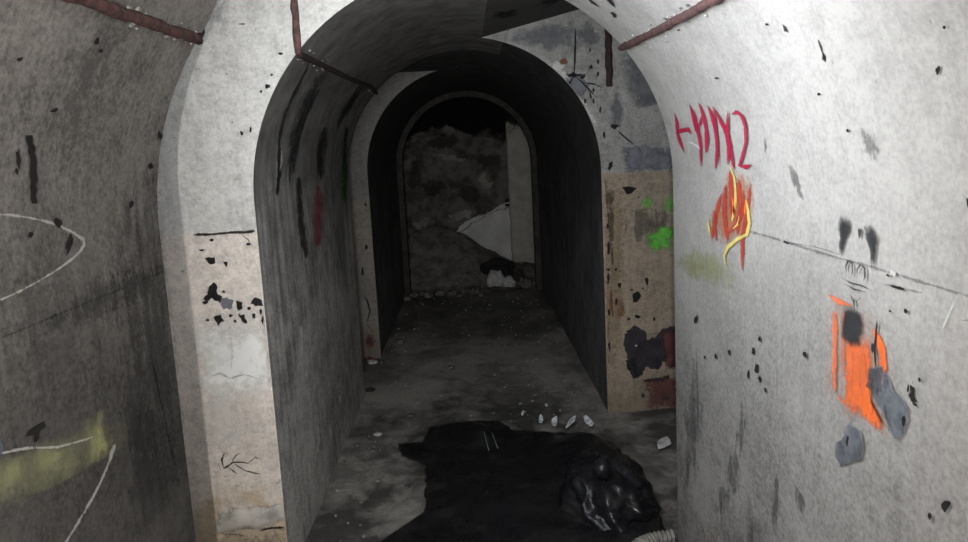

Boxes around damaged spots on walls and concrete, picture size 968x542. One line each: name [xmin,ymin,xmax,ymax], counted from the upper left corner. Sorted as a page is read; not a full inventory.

peeling [607,268,648,315]
peeling [198,282,270,401]
peeling [623,315,676,409]
crack [218,453,262,474]